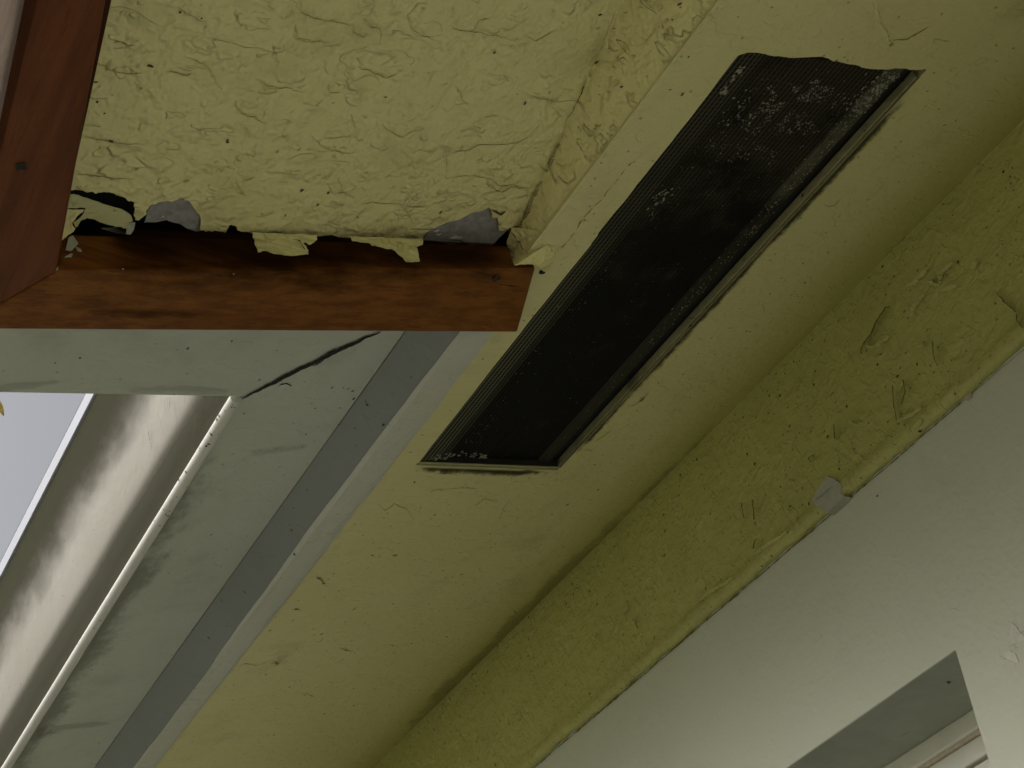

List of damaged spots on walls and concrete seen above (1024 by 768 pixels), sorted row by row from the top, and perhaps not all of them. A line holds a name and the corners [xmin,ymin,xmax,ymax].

peeling [55,194,201,271]
peeling [252,230,317,256]
spalling [349,206,561,272]
crack [242,332,381,399]
spalling [812,476,852,515]